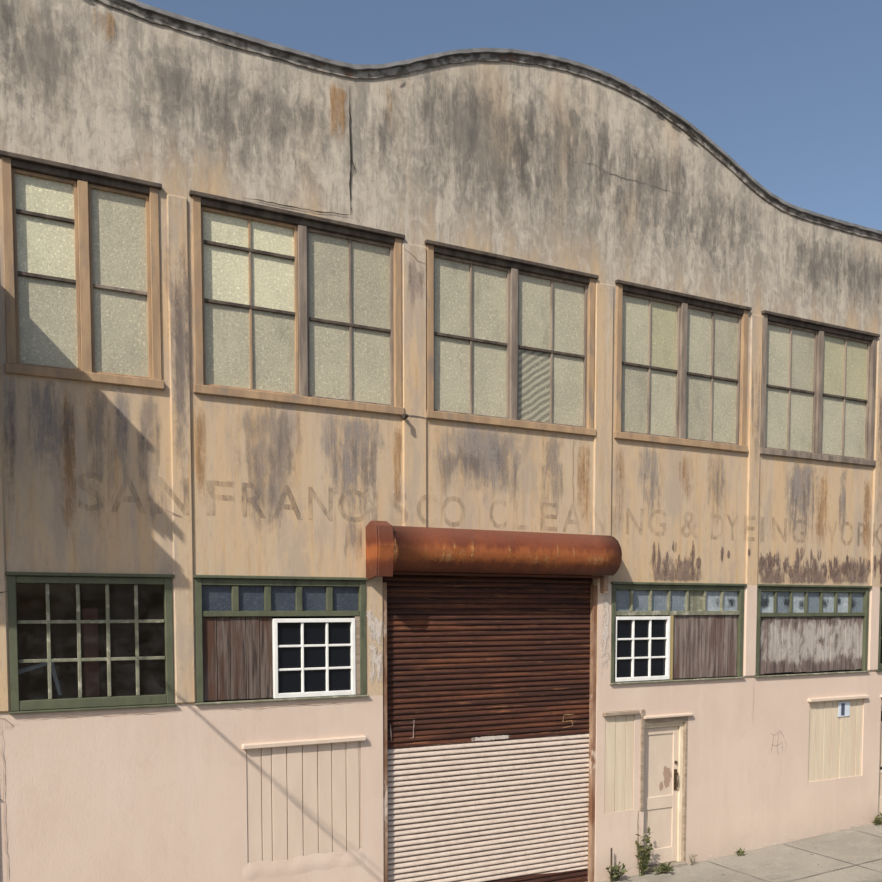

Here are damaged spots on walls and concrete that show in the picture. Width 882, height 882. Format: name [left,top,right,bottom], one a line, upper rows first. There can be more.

crack [243,100,355,215]
crack [587,163,673,193]
water stain [175,295,186,441]
peeling [652,542,701,581]
peeling [748,547,882,584]